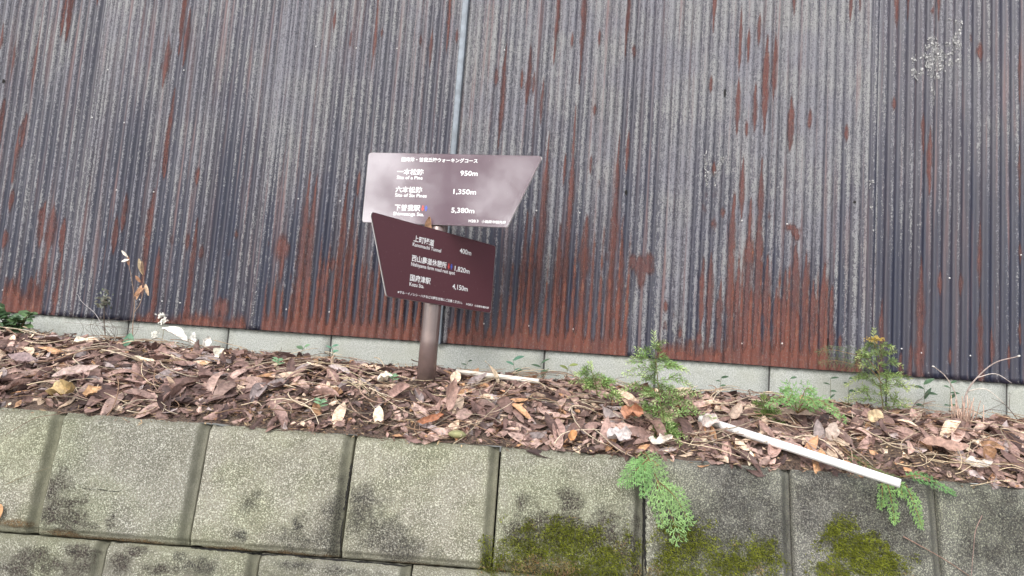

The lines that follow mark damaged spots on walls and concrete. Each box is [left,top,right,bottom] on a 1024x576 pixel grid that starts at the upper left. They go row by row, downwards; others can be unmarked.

corrosion [8,114,28,212]
corrosion [735,8,778,136]
corrosion [787,97,795,151]
corrosion [1,202,66,315]
corrosion [112,195,128,254]
corrosion [137,190,246,329]
corrosion [261,172,422,341]
corrosion [447,108,654,356]
corrosion [657,158,862,372]
leakage [41,469,115,531]
leakage [507,488,641,573]
leakage [795,472,924,560]